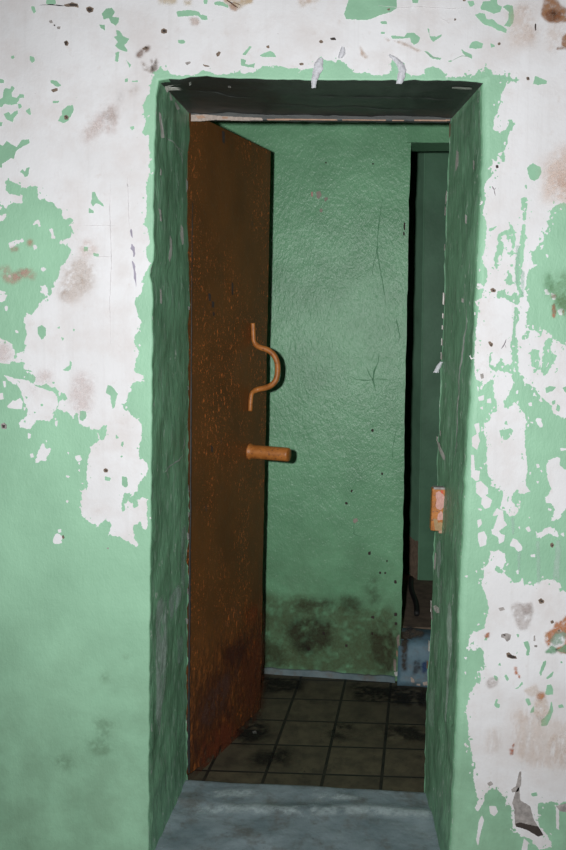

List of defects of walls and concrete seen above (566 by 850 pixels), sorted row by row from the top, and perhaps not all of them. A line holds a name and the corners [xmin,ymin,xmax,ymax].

peeling [0,0,566,552]
peeling [464,550,566,850]
corrosion [546,617,566,653]